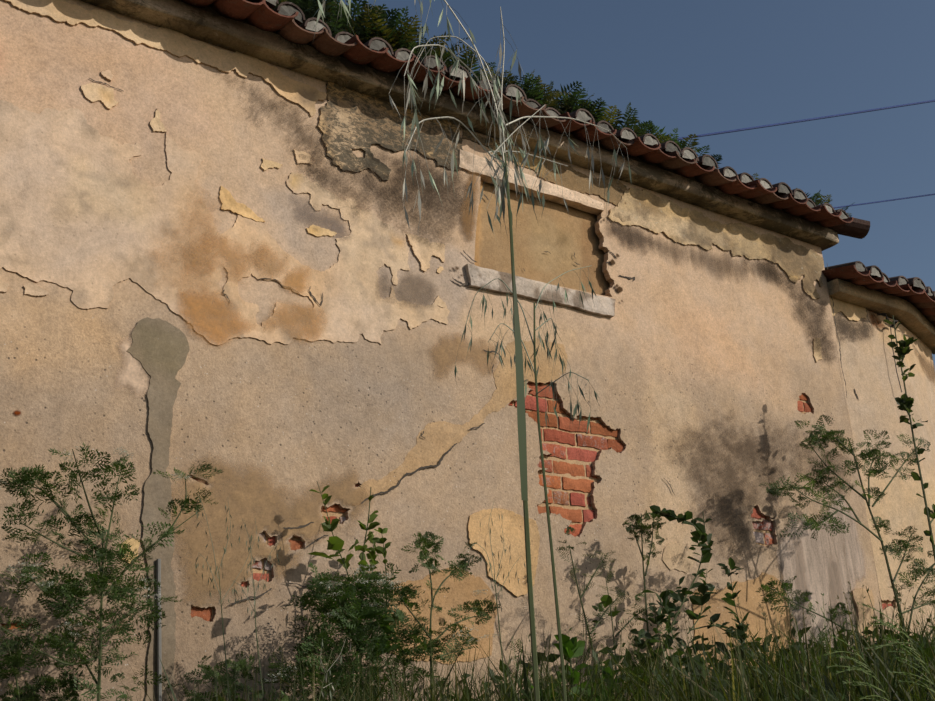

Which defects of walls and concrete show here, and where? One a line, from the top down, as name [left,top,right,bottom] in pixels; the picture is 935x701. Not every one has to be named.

peeling [0,0,867,346]
flaking render [797,393,812,414]
crack [361,423,485,504]
flaking render [508,382,624,537]
leakage [679,417,844,543]
flaking render [259,532,275,546]
flaking render [288,537,303,550]
flaking render [320,504,348,524]
flaking render [751,506,774,548]
flaking render [241,558,272,588]